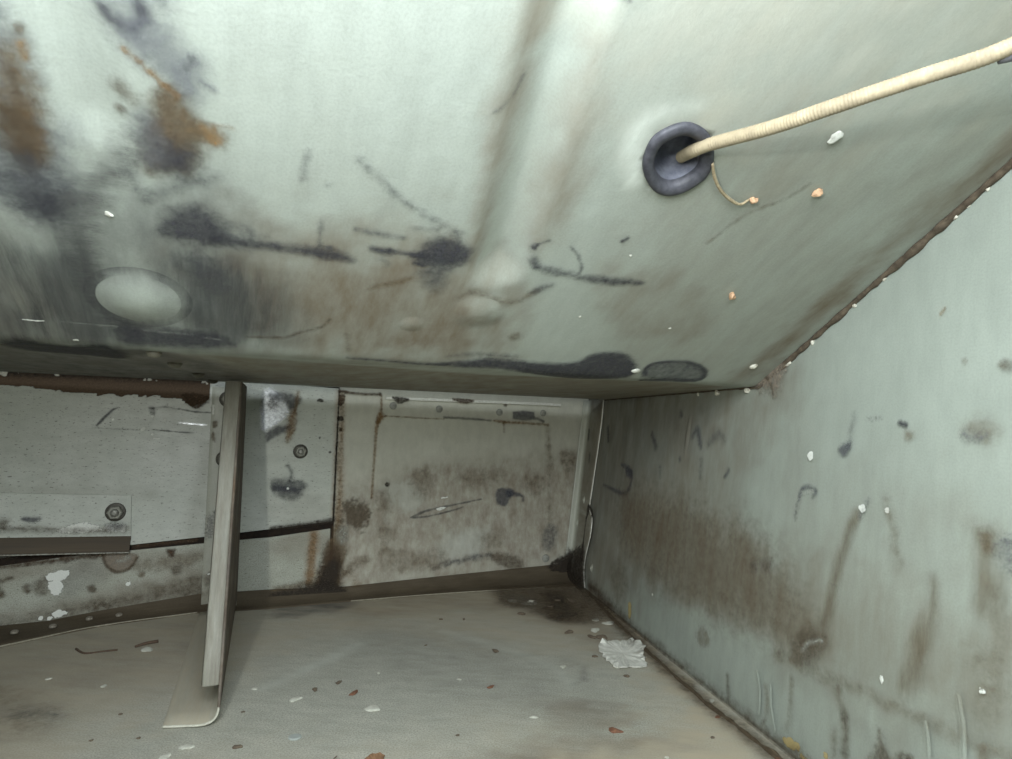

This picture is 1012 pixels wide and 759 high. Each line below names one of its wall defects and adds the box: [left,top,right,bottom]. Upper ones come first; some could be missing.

rust [144,83,221,173]
rust [270,389,426,590]
rust [133,538,198,557]
rust [0,554,103,597]
peeling [38,570,70,596]
peeling [38,610,67,621]